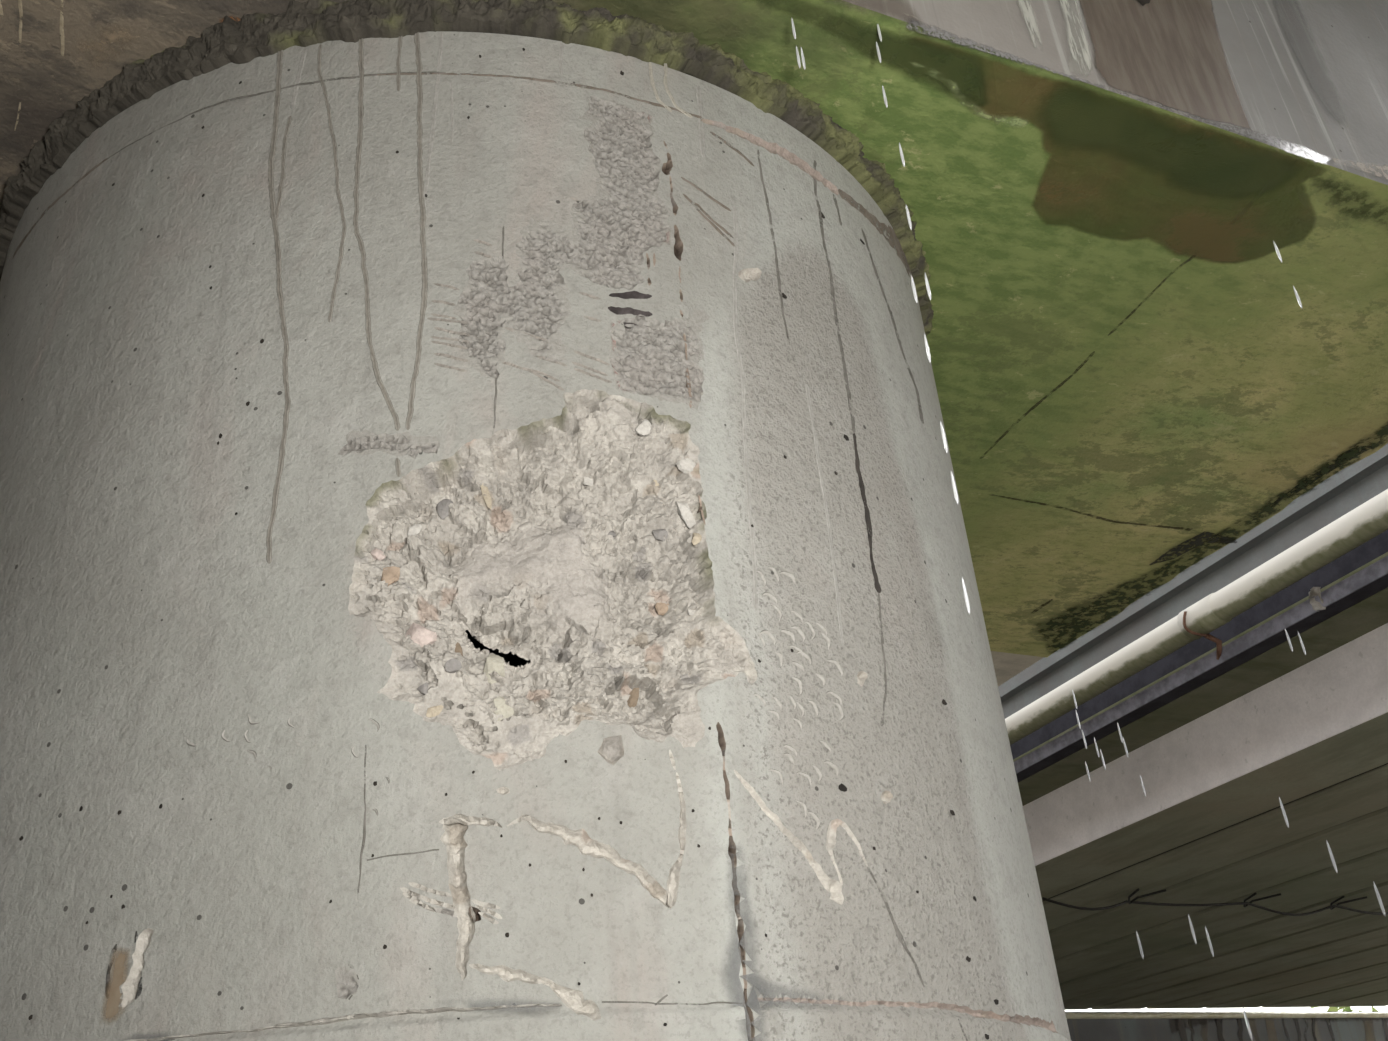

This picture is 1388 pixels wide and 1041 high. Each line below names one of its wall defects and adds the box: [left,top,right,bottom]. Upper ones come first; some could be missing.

damp [759,0,1330,263]
crack [13,71,911,408]
spalling [608,291,652,329]
crack [980,256,1192,459]
crack [697,495,706,525]
crack [992,494,1193,531]
spalling [348,389,757,795]
crack [602,722,1058,1041]
peeling [121,928,154,1009]
damp [1170,1011,1260,1041]
damp [1282,1018,1388,1041]